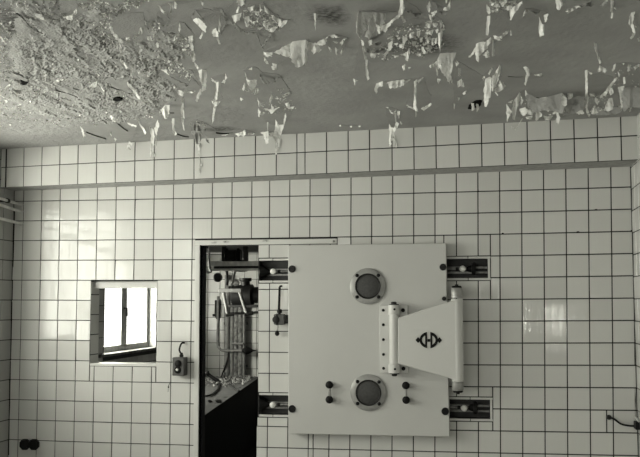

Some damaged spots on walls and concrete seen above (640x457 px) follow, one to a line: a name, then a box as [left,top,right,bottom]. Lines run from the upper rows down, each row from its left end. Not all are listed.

peeling [0,0,348,175]
peeling [353,0,549,147]
peeling [505,42,640,131]